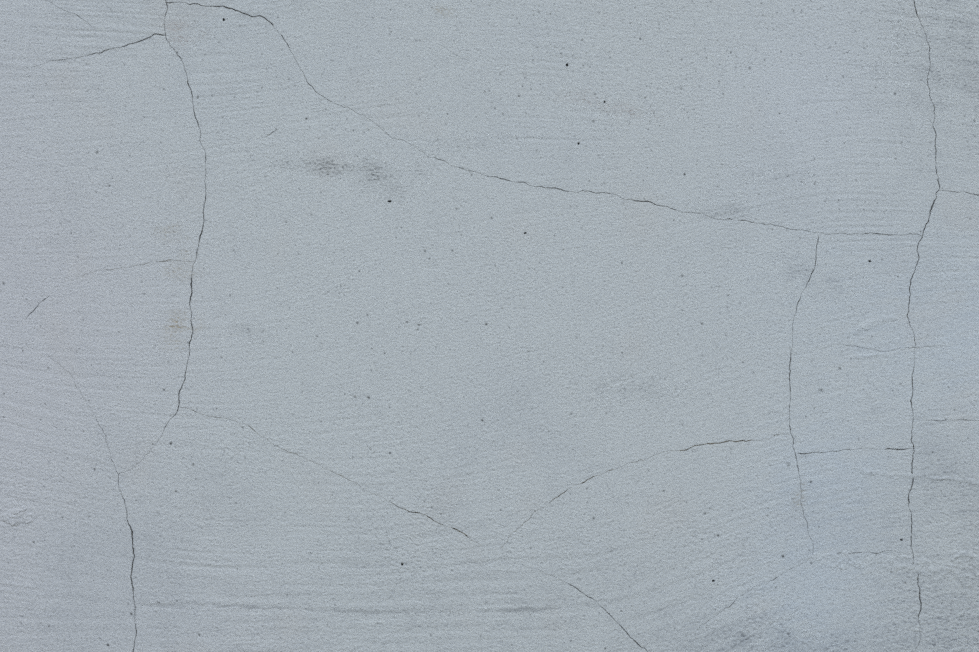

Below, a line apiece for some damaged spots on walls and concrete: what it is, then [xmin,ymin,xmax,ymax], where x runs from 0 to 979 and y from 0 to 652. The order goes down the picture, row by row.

crack [41,0,378,652]
crack [389,1,979,652]